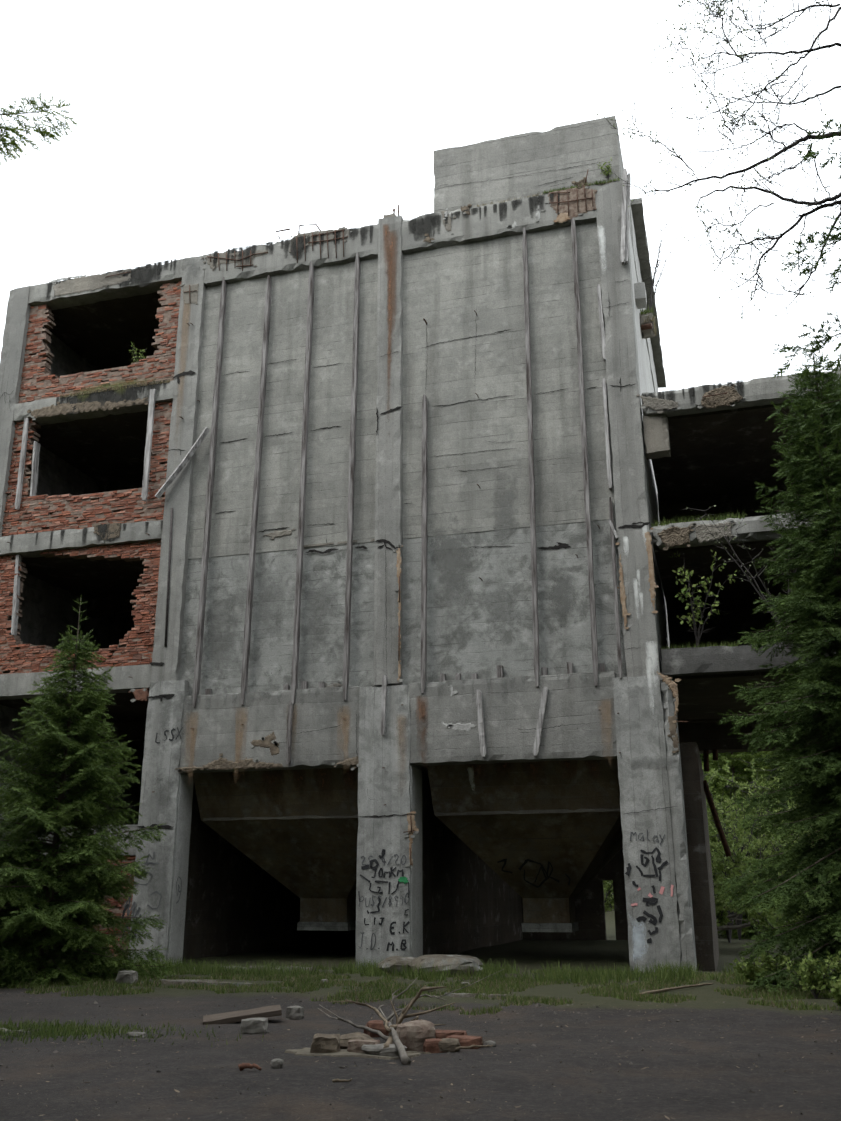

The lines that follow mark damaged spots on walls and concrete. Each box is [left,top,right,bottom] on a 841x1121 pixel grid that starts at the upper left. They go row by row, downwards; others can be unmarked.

water stain [409,193,560,240]
rust [384,225,395,378]
spalling [636,394,681,414]
spalling [695,384,745,409]
spalling [644,519,738,614]